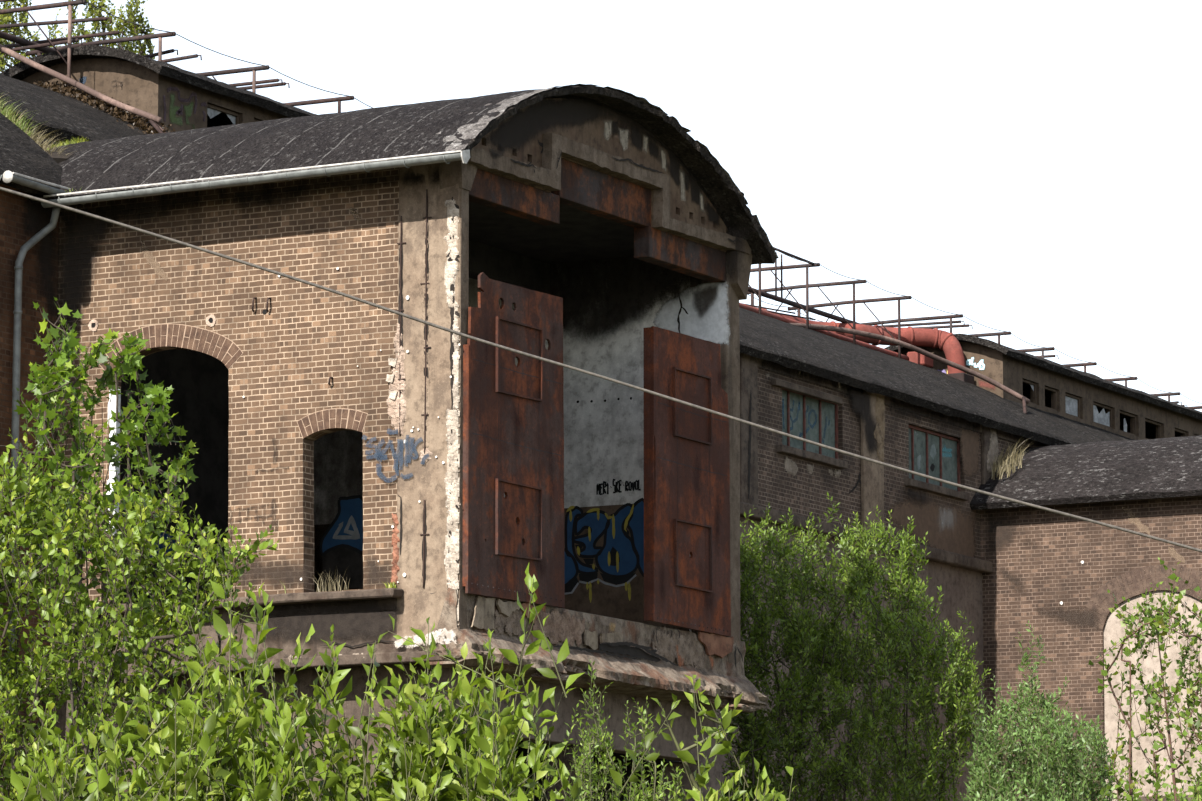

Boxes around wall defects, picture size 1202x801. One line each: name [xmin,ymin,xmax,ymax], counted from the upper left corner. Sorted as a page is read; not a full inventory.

spalling [386,216,406,437]
spalling [390,495,402,585]
spalling [394,189,734,670]
spalling [531,671,585,697]